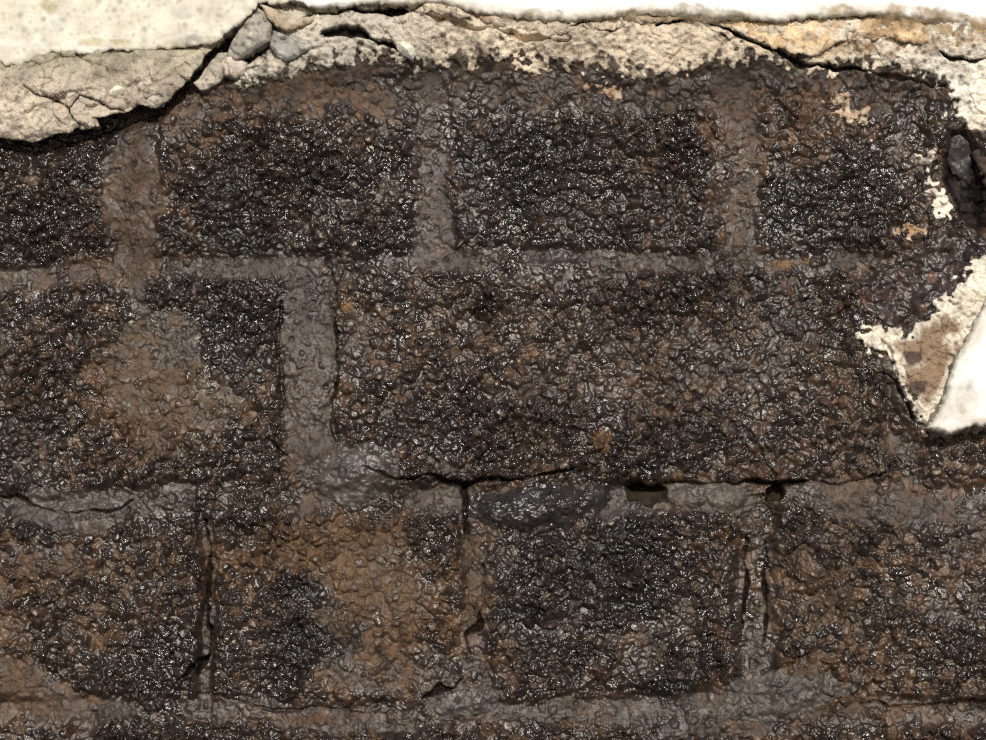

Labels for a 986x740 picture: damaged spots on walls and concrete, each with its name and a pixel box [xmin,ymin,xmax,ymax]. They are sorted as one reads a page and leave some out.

crack [655,20,864,72]
crack [939,51,986,63]
crack [24,86,125,126]
spalling [0,2,986,188]
spalling [915,148,953,231]
spalling [893,223,928,241]
spalling [855,242,986,438]
crack [402,467,577,534]
crack [731,478,810,486]
crack [182,519,214,678]
crack [465,611,484,651]
crack [739,544,768,640]